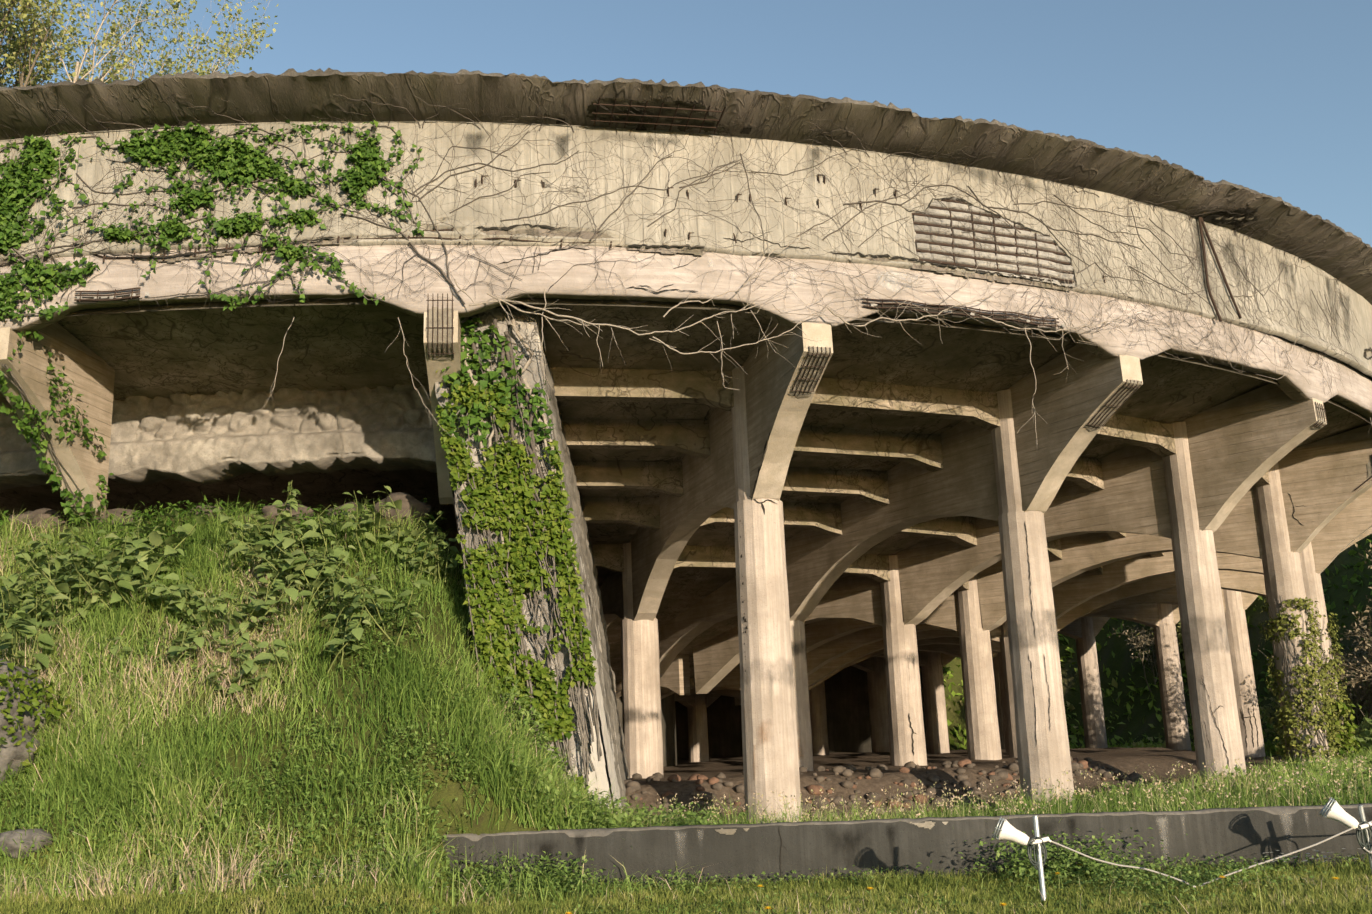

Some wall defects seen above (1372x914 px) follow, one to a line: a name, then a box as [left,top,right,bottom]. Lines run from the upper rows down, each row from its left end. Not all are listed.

spalling [831,197,1077,291]
spalling [425,293,455,361]
spalling [788,346,831,398]
crack [908,715,916,756]